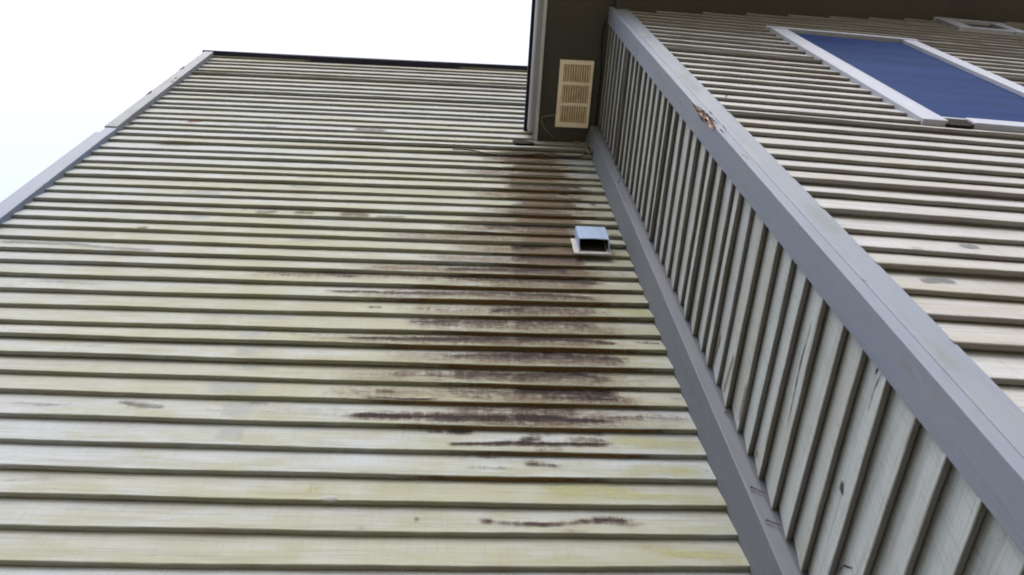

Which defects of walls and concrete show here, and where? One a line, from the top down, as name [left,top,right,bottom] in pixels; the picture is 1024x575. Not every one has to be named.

damp [274,150,678,482]
damp [482,517,634,531]